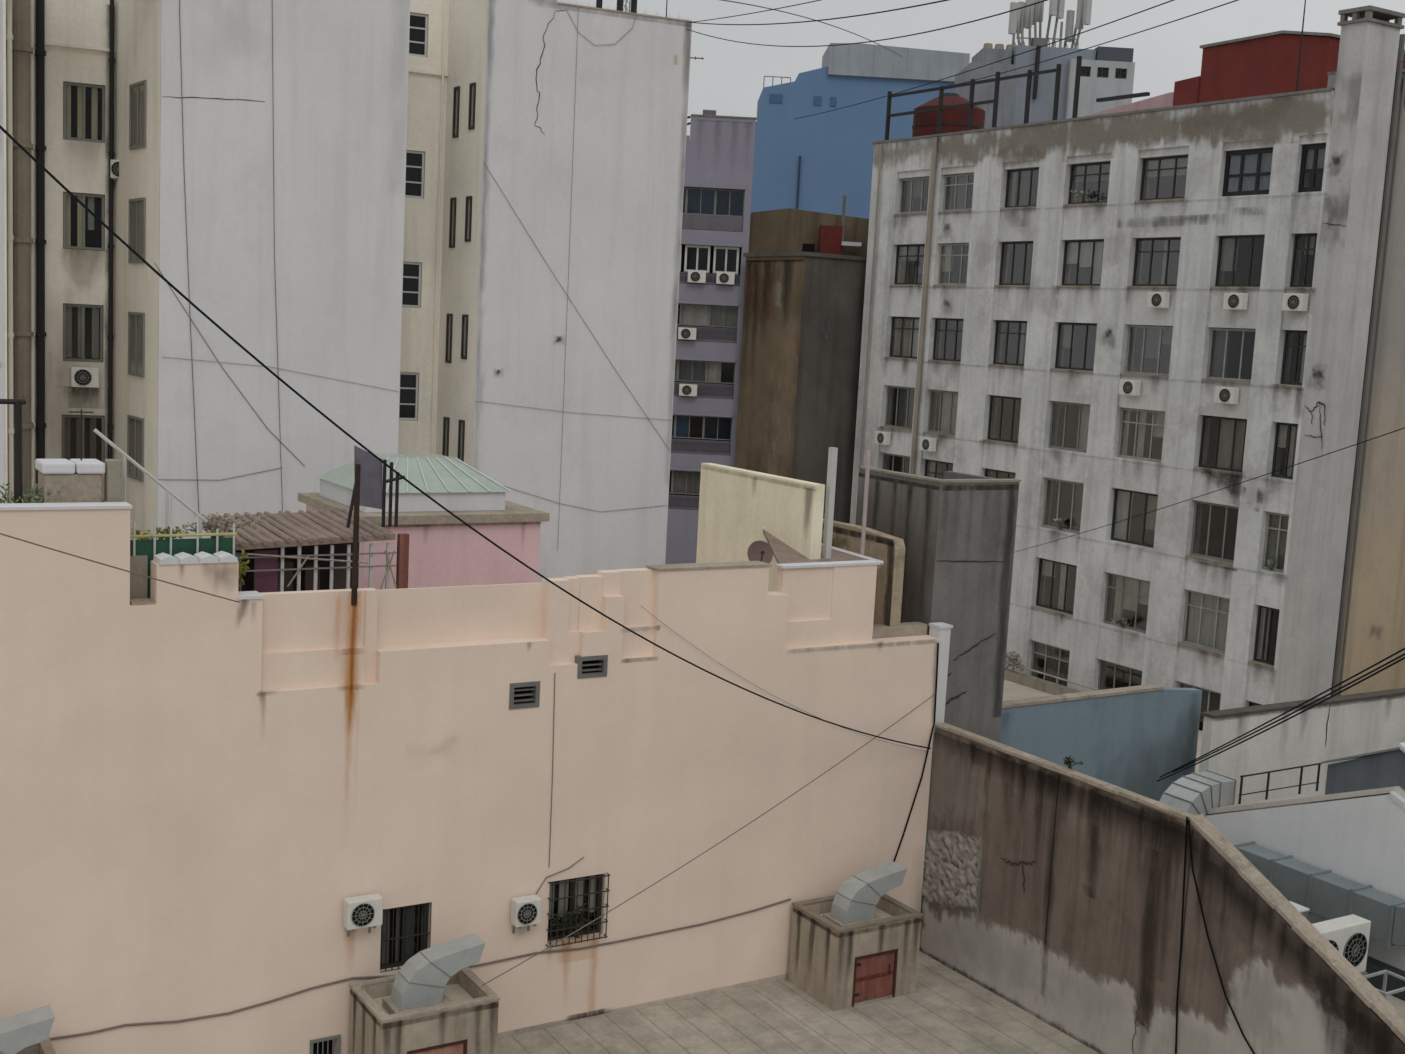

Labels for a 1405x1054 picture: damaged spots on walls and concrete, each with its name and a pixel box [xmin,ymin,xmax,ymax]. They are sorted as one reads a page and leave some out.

crack [535,10,565,133]
rust [346,592,359,719]
peeling [920,831,1348,1054]
leakage [971,745,1405,1054]